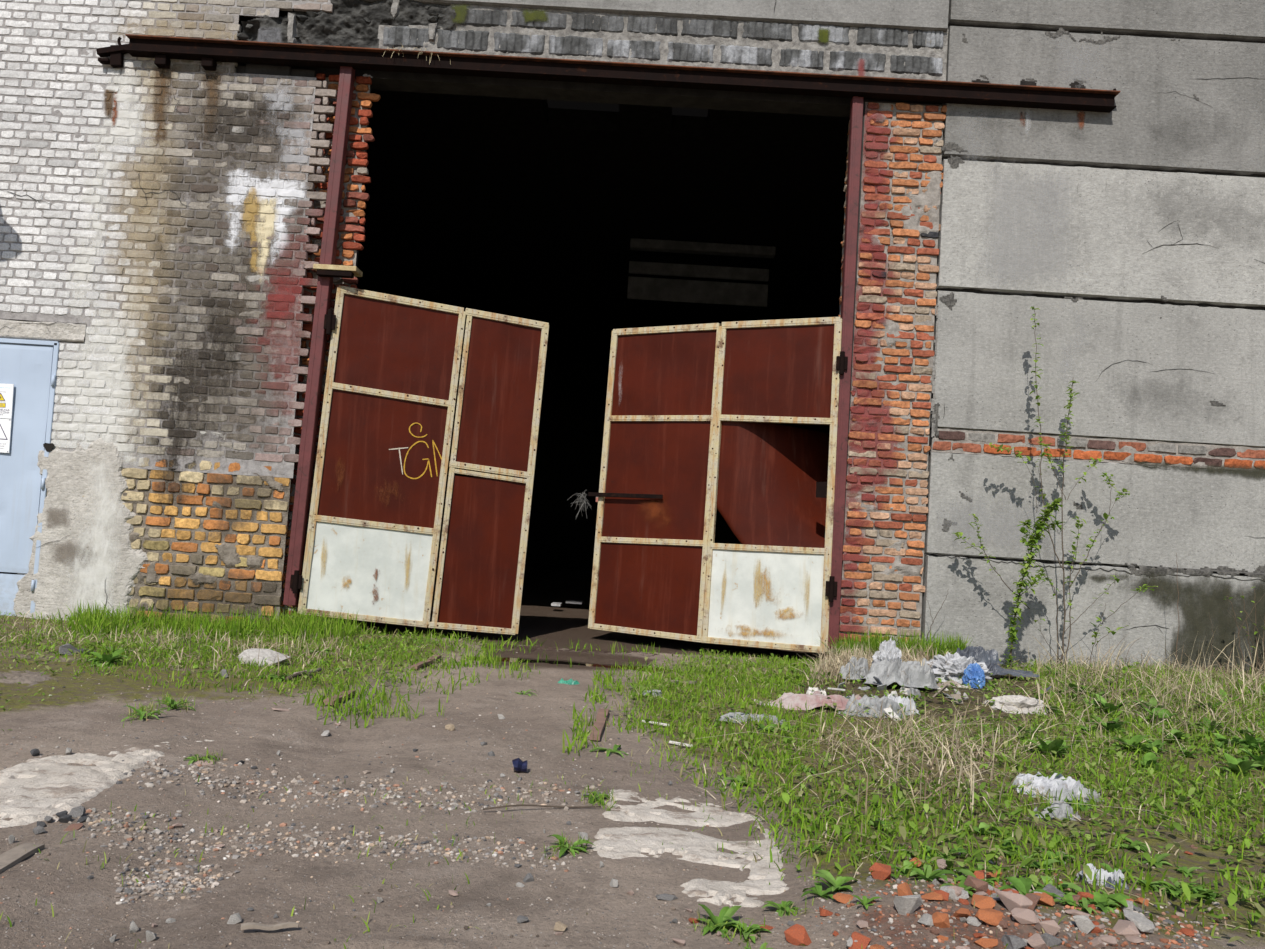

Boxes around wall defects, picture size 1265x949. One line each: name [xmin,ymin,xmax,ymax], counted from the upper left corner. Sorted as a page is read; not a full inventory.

spalling [237,0,456,48]
rust [105,90,117,126]
damp [203,74,220,139]
damp [226,169,305,276]
crack [1145,220,1219,253]
damp [202,299,247,377]
damp [158,368,189,505]
flaking render [13,438,159,620]
flaking render [215,542,241,568]
rust [754,564,771,599]
rust [738,626,775,636]
damp [1092,574,1265,677]